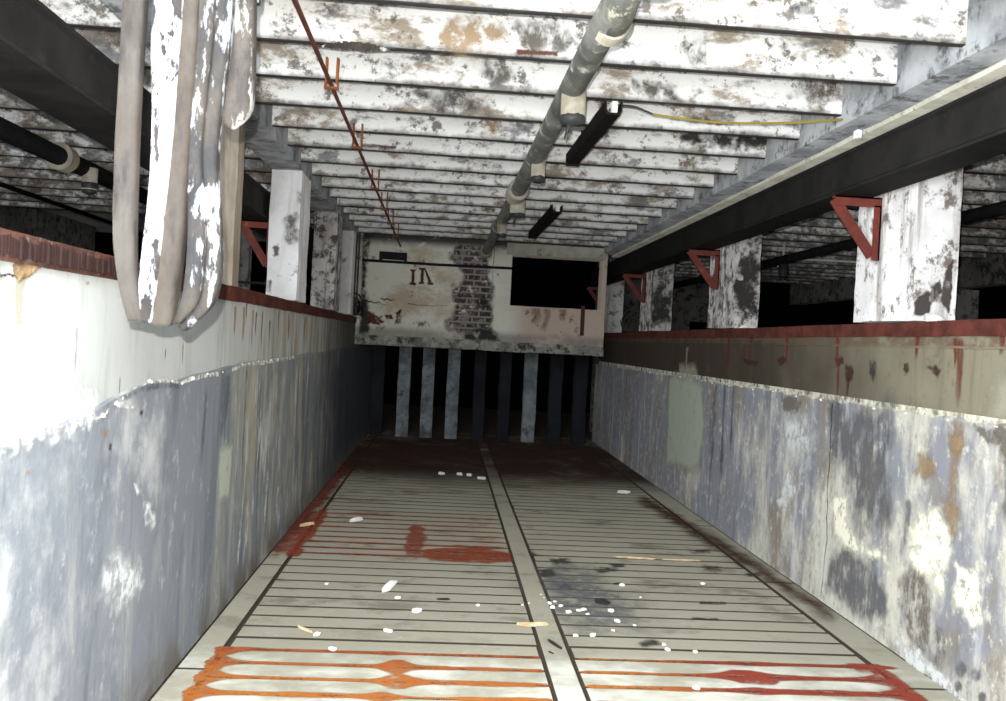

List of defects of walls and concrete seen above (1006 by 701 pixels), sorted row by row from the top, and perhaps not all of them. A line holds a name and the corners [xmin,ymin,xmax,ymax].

leakage [439,20,504,50]
leakage [516,24,572,52]
spalling [445,244,494,332]
corrosion [836,338,853,393]
corrosion [954,339,962,391]
leakage [977,380,1006,457]
corrosion [917,454,934,478]
corrosion [950,425,963,492]
corrosion [945,503,958,535]
leakage [827,551,886,618]